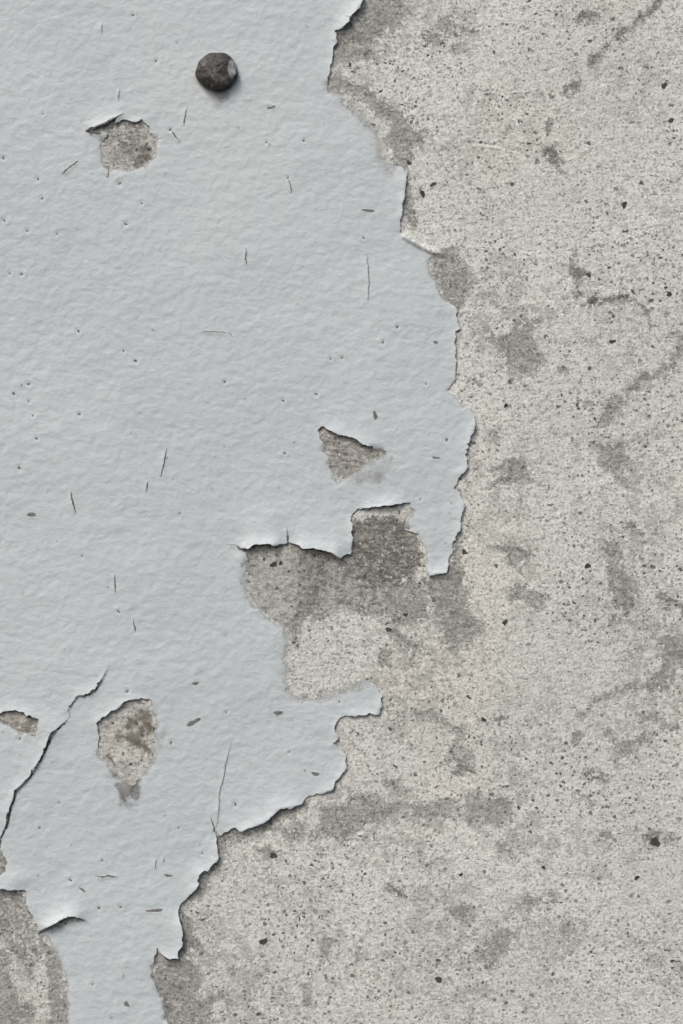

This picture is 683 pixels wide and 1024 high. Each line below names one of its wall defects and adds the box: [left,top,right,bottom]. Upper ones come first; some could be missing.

spalling [586,0,661,68]
peeling [86,107,157,185]
peeling [325,0,425,230]
spalling [542,143,564,168]
peeling [318,417,387,479]
peeling [445,415,476,481]
spalling [588,330,683,481]
peeling [238,489,486,668]
crack [0,670,108,875]
peeling [90,690,157,787]
peeling [0,867,100,1024]
peeling [151,775,516,1024]